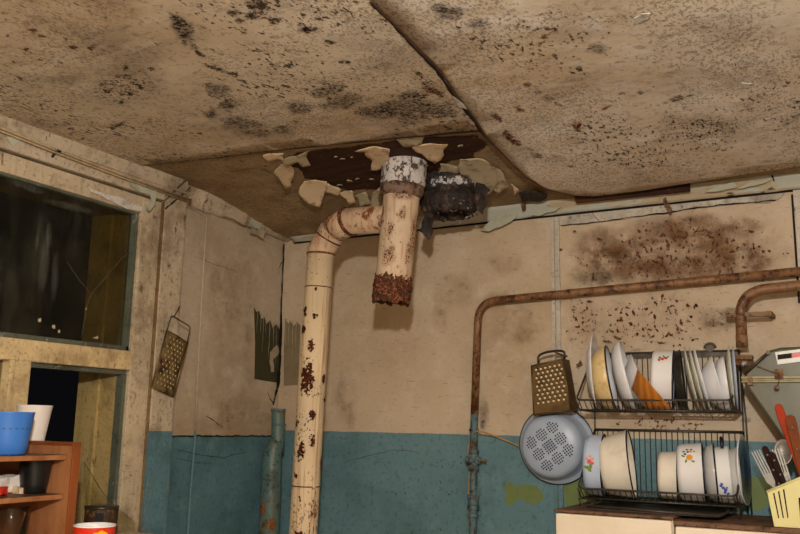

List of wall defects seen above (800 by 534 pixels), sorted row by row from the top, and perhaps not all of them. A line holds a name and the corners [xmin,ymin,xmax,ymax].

water stain [169,13,238,76]
water stain [204,83,293,137]
crack [156,2,494,174]
peeling [263,135,519,207]
corrosion [595,211,790,282]
crack [268,244,285,405]
peeling [254,308,301,386]
corrosion [566,291,728,352]
peeling [504,479,544,510]